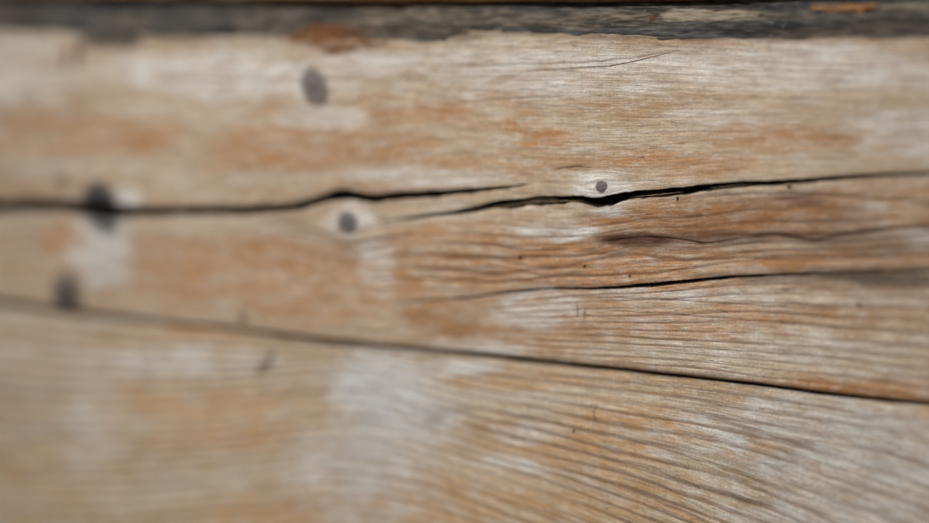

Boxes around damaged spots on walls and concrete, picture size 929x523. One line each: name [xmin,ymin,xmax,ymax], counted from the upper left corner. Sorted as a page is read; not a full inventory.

crack [0,172,929,222]
crack [404,270,929,319]